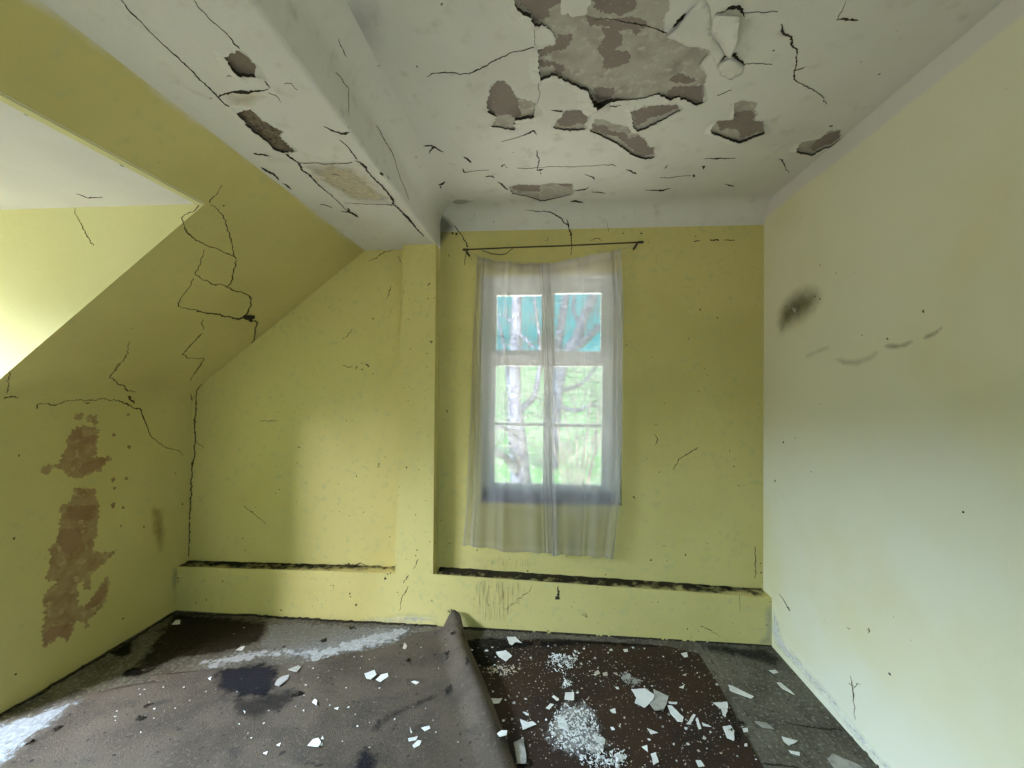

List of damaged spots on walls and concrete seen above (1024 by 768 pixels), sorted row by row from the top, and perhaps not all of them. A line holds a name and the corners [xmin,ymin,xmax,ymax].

crack [121,0,297,107]
peeling [214,48,268,83]
peeling [226,105,299,154]
crack [253,42,424,237]
crack [428,24,535,77]
peeling [506,182,575,202]
crack [425,130,735,252]
peeling [480,0,745,161]
peeling [704,99,773,146]
crack [715,5,827,104]
crack [3,186,258,557]
peeling [40,412,128,648]